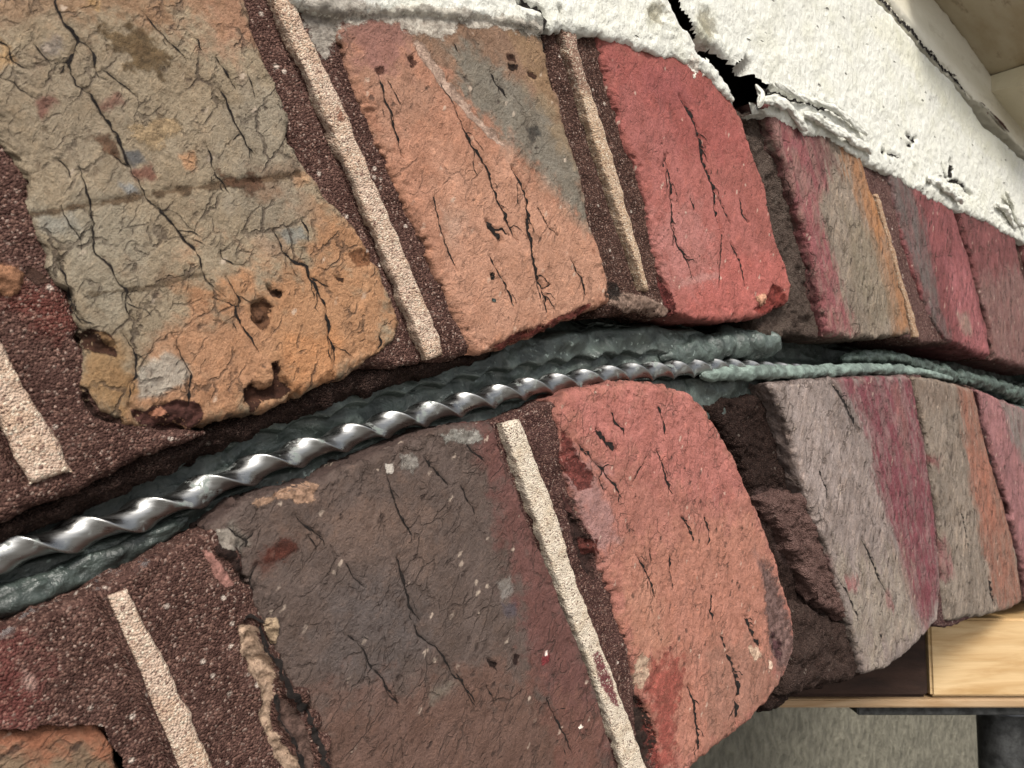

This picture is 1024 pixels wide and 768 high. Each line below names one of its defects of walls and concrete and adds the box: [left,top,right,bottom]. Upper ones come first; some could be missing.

crack [0,0,260,354]
crack [441,84,556,321]
crack [663,100,747,281]
spalling [73,328,117,357]
spalling [80,387,113,423]
crack [58,160,193,410]
spalling [131,399,204,431]
spalling [251,289,282,330]
spalling [243,360,291,413]
crack [273,220,354,366]
crack [577,406,673,502]
spalling [760,560,794,668]